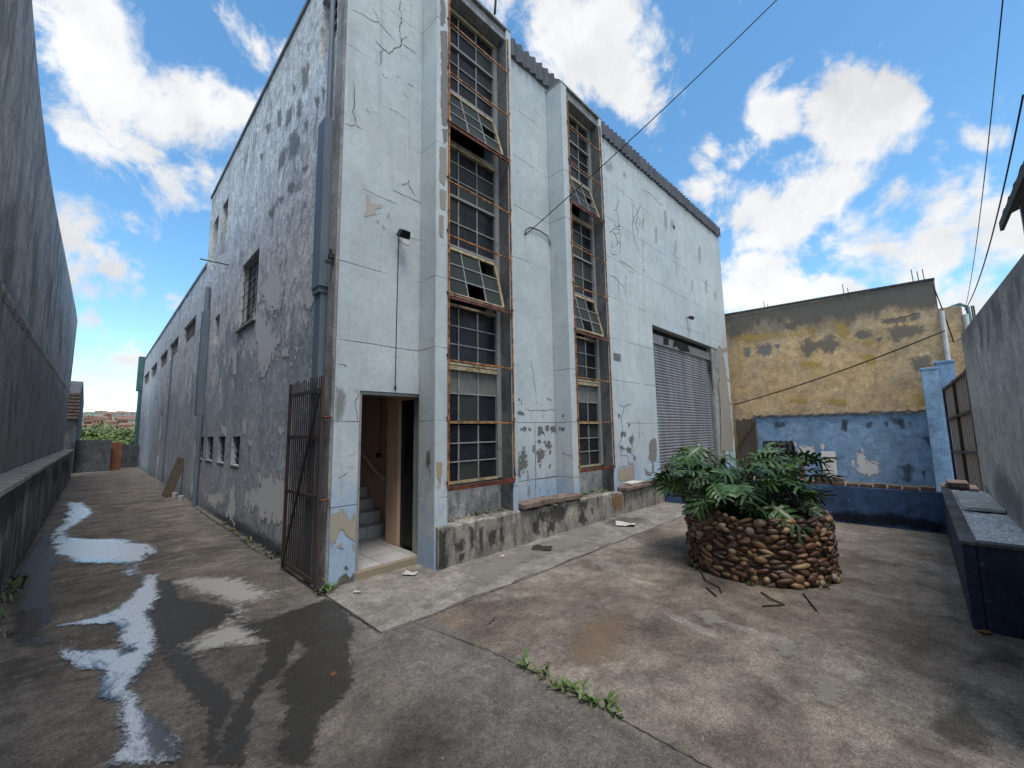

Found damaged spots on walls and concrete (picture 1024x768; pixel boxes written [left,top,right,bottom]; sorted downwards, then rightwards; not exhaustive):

crack [346,1,414,129]
spalling [266,63,309,171]
peeling [365,194,421,245]
crack [610,188,677,289]
peeling [230,259,314,383]
peeling [730,312,925,369]
peeling [190,418,297,535]
peeling [518,398,564,478]
peeling [851,448,883,477]
peeling [330,509,356,550]
spalling [335,566,354,587]
water stain [439,500,614,578]